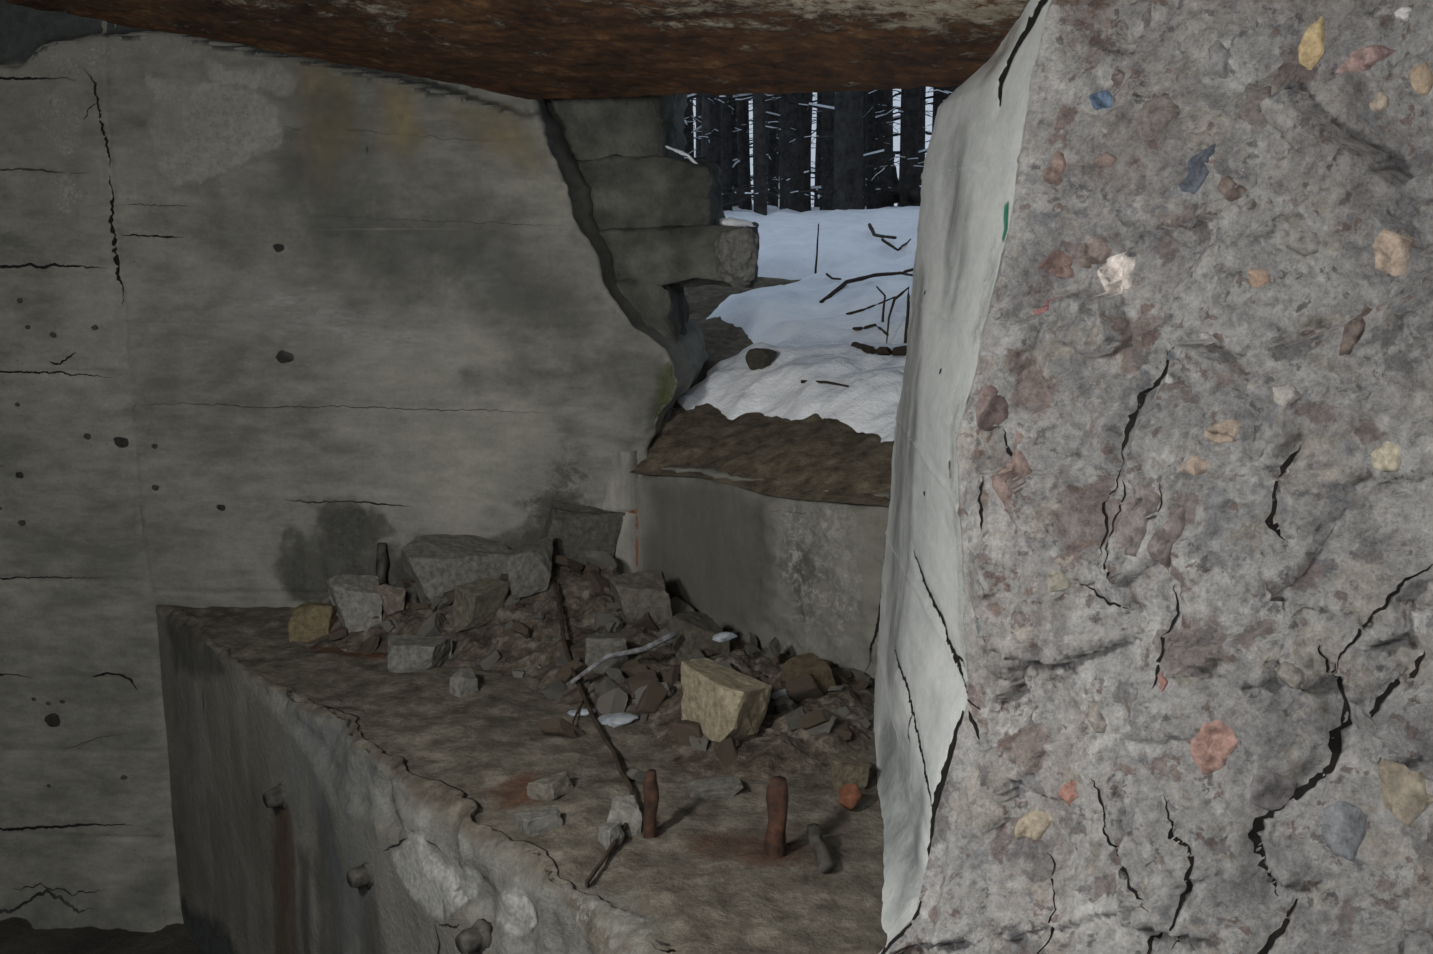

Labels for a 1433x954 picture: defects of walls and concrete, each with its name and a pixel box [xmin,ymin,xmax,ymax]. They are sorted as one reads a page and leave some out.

crack [998,0,1047,107]
crack [0,69,186,305]
crack [1080,349,1169,610]
crack [1265,445,1301,540]
water stain [280,502,411,602]
crack [864,552,981,857]
crack [1248,564,1433,954]
spalling [392,831,484,921]
spalling [497,893,537,937]
crack [880,900,922,954]
crack [1091,779,1194,954]